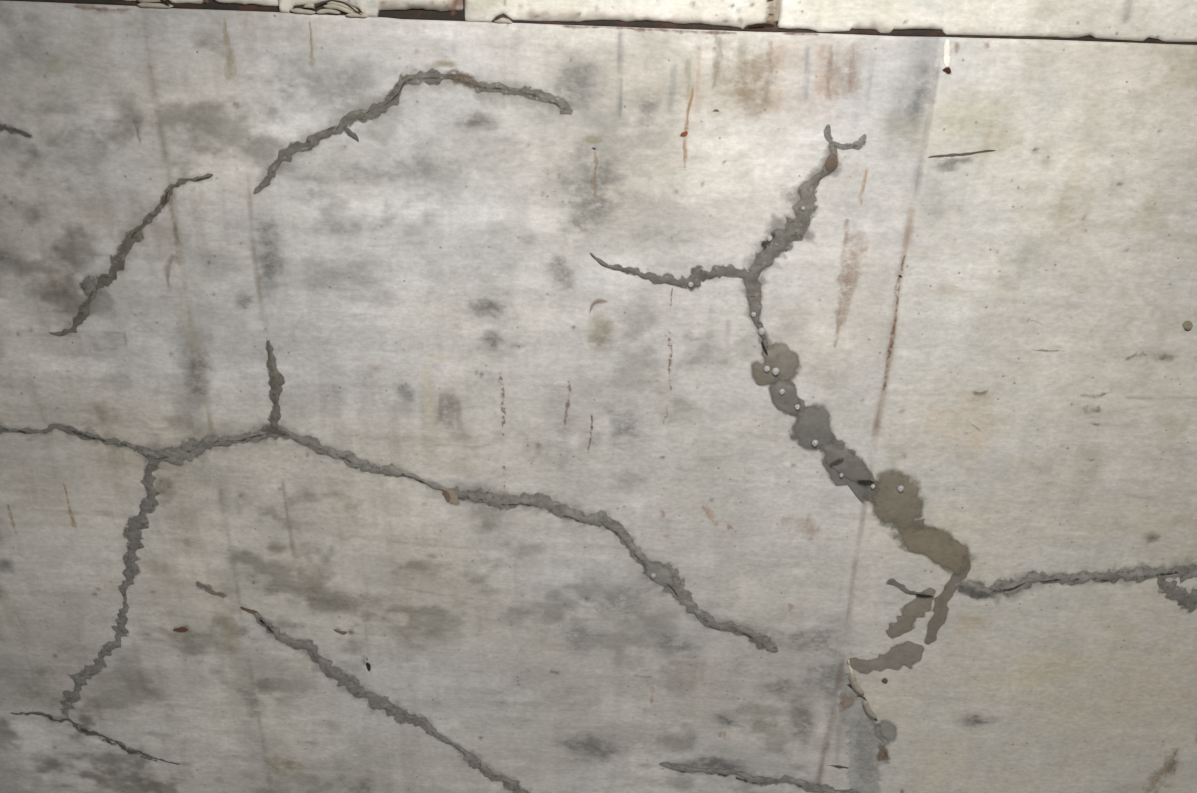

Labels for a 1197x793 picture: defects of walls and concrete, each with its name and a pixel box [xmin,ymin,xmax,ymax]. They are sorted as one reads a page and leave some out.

crack [0,124,31,137]
crack [254,62,572,194]
crack [50,174,213,336]
crack [590,125,1197,684]
crack [0,340,778,793]
crack [659,760,859,793]